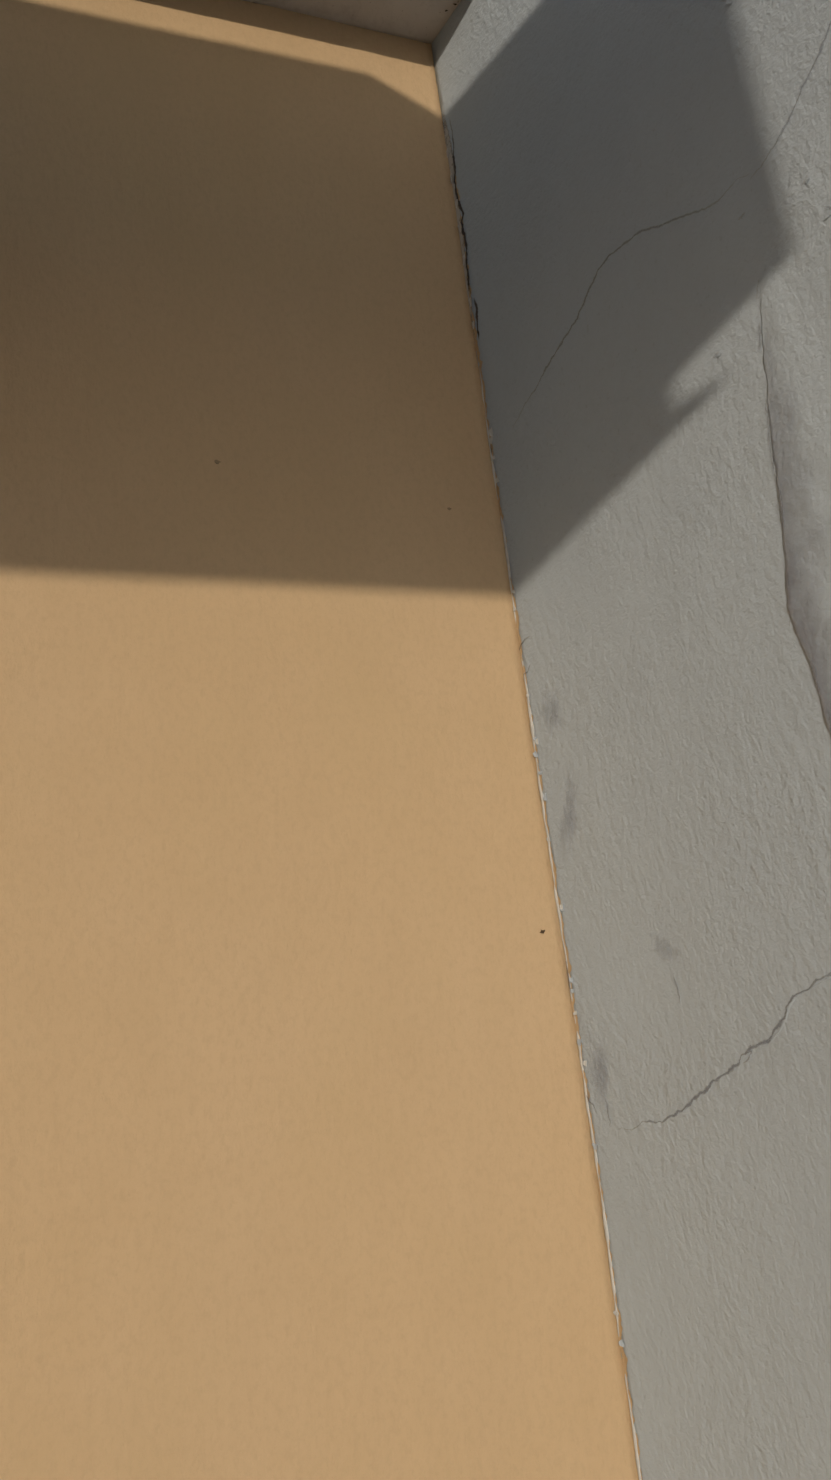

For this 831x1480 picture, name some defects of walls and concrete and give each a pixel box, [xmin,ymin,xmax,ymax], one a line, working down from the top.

crack [668,975,831,1118]